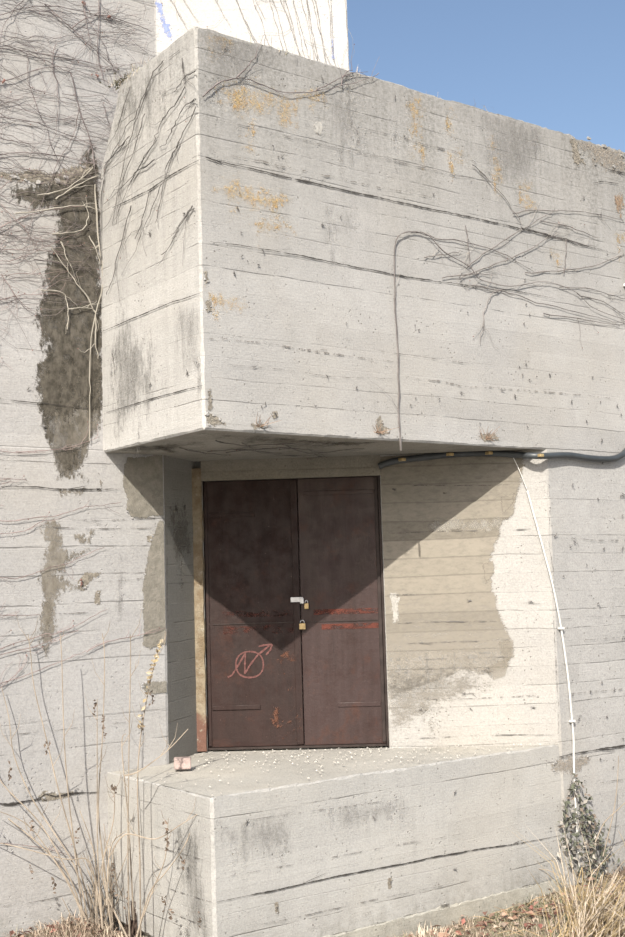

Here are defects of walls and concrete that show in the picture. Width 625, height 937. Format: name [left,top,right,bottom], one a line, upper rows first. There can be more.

spalling [569,136,625,173]
spalling [0,163,91,186]
peeling [123,455,166,649]